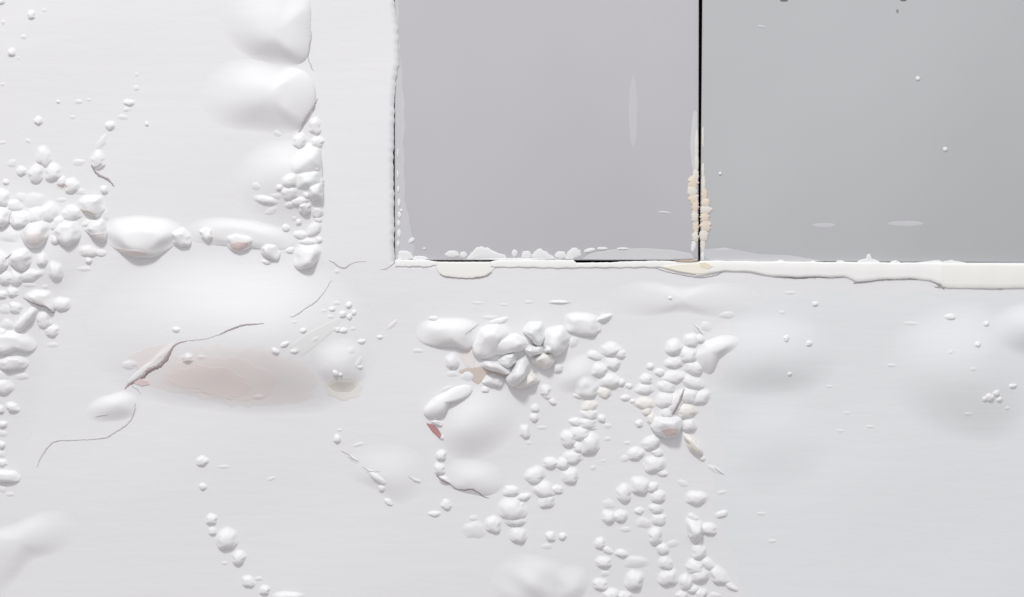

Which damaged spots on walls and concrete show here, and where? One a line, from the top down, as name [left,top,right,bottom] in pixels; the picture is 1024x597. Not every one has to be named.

crack [291,260,395,317]
crack [37,323,264,466]
damp [128,343,363,408]